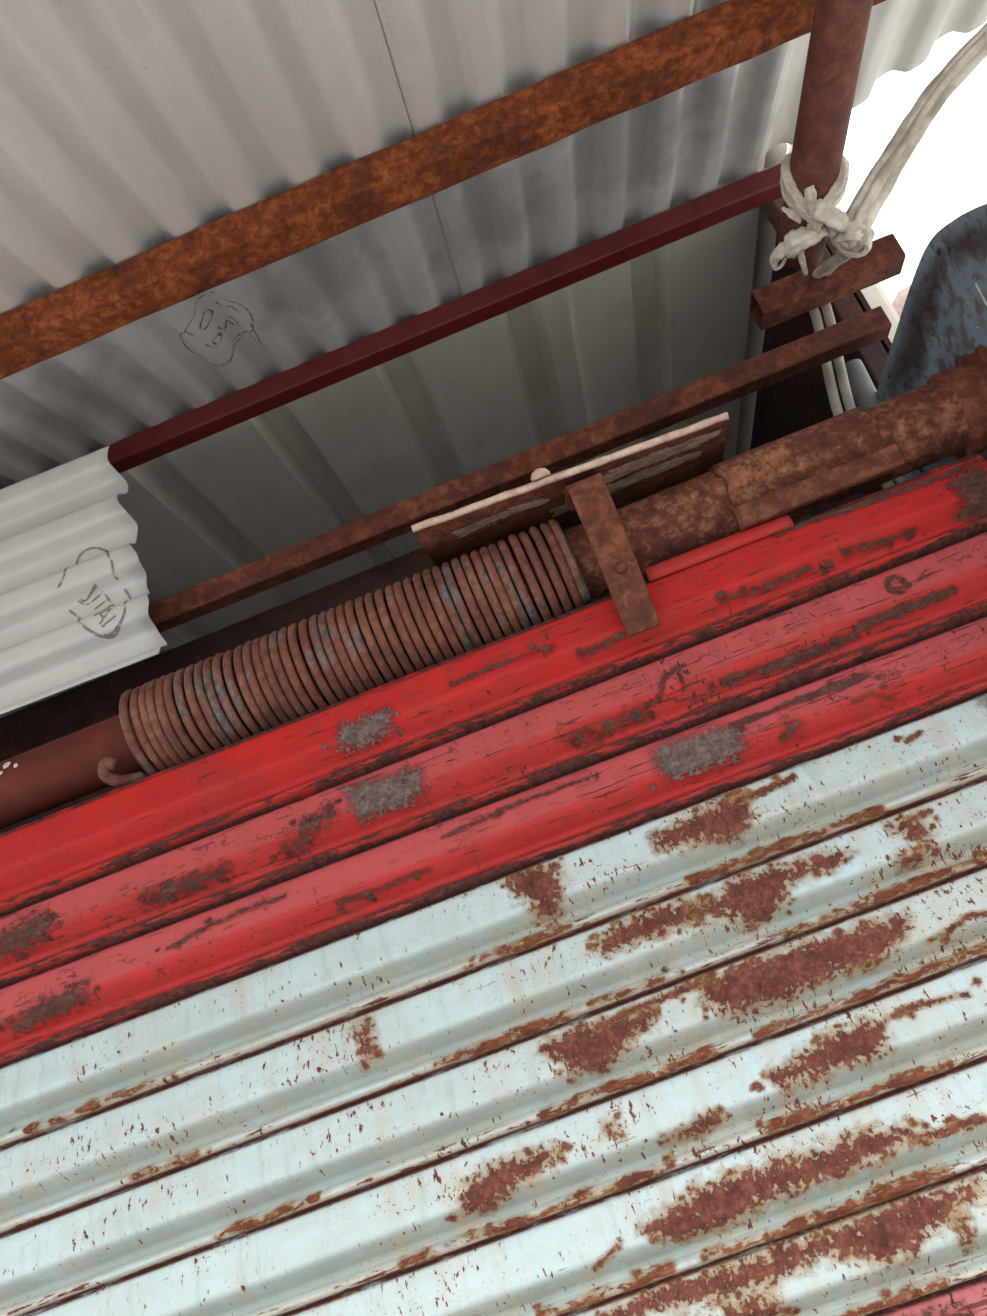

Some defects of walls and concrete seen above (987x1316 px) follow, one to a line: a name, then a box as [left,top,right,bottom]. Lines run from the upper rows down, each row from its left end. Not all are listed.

peeling [321,702,403,757]
peeling [648,673,884,791]
peeling [269,762,433,861]
peeling [135,859,235,909]
peeling [0,908,63,965]
corrosion [433,772,987,1135]
peeling [0,976,100,1039]
corrosion [398,1105,732,1270]
corrosion [532,1112,987,1316]